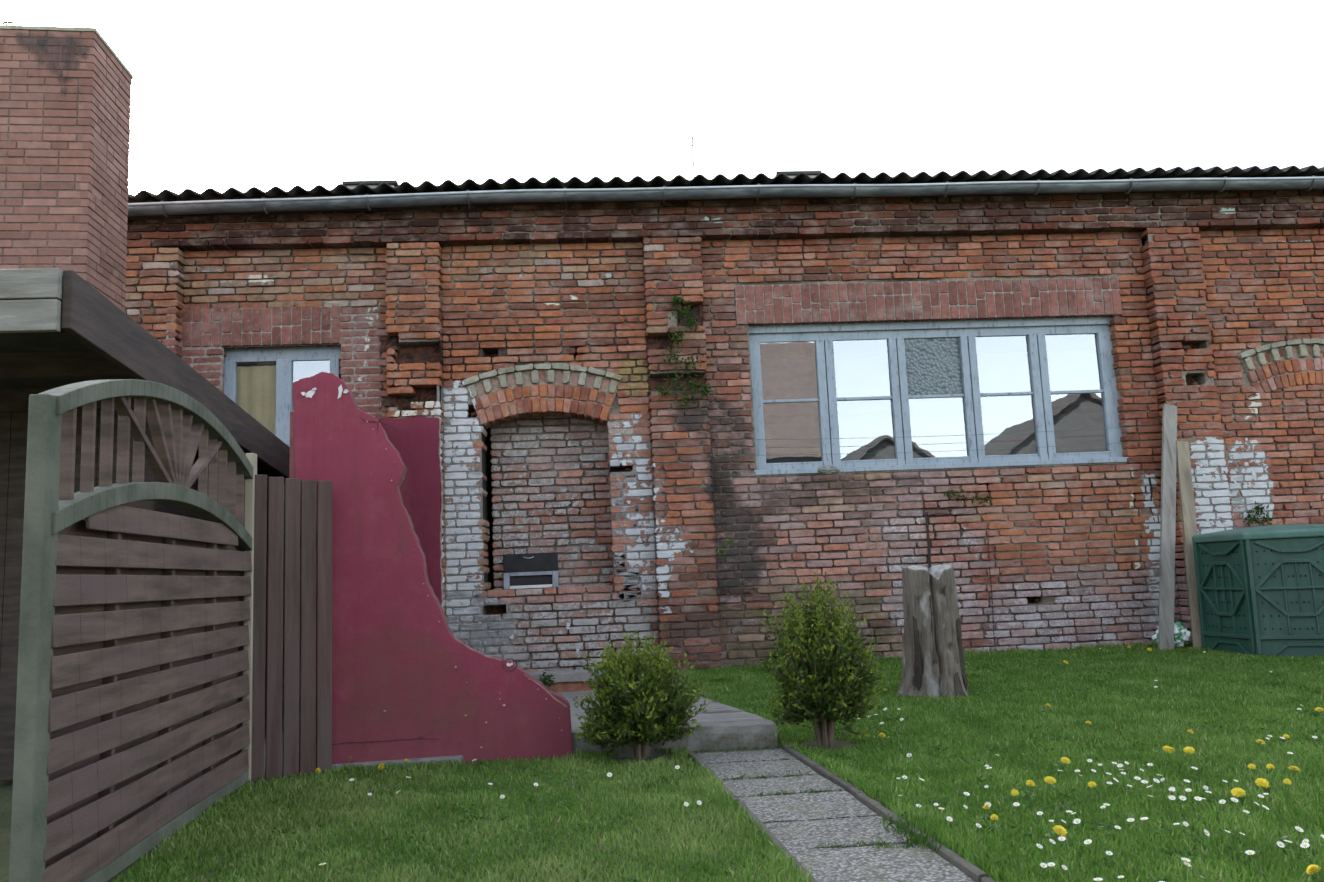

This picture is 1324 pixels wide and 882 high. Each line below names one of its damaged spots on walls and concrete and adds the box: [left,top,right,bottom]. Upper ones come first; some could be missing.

peeling [380,381,694,731]
peeling [1189,437,1275,535]